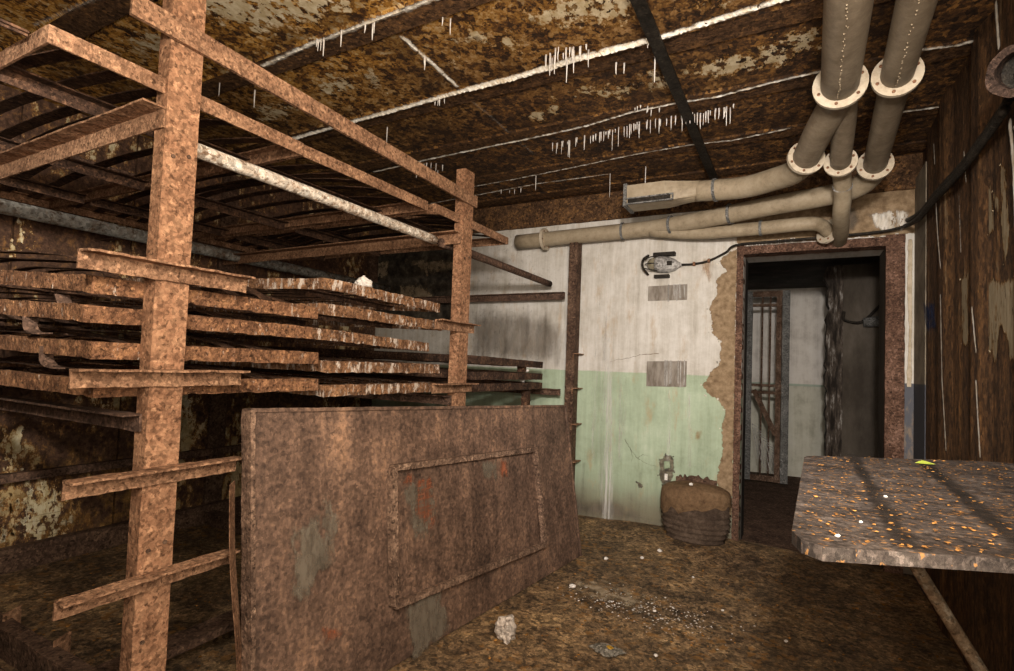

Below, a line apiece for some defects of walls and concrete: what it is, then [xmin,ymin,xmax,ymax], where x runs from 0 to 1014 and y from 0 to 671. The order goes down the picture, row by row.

leakage [261,0,435,67]
leakage [661,0,789,40]
leakage [352,36,656,123]
leakage [292,127,333,139]
leakage [419,71,820,196]
peeling [734,205,833,224]
peeling [987,164,1010,265]
peeling [848,189,915,387]
peeling [959,274,969,346]
peeling [989,277,1014,362]
peeling [700,231,817,532]